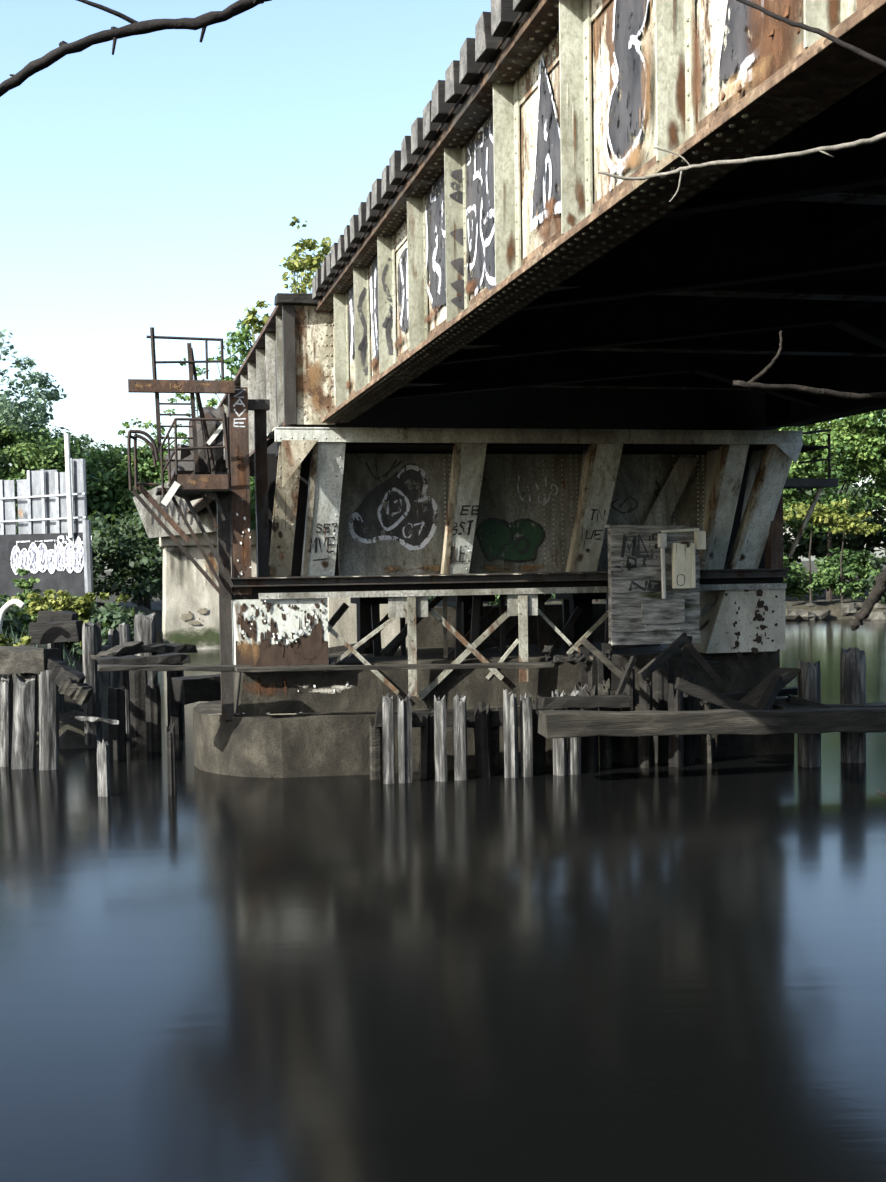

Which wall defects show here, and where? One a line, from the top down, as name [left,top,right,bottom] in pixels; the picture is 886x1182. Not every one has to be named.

rust [828,0,840,31]
rust [639,0,652,120]
rust [721,0,804,103]
rust [622,147,640,168]
rust [536,183,585,241]
rust [305,342,321,409]
peeling [235,600,329,667]